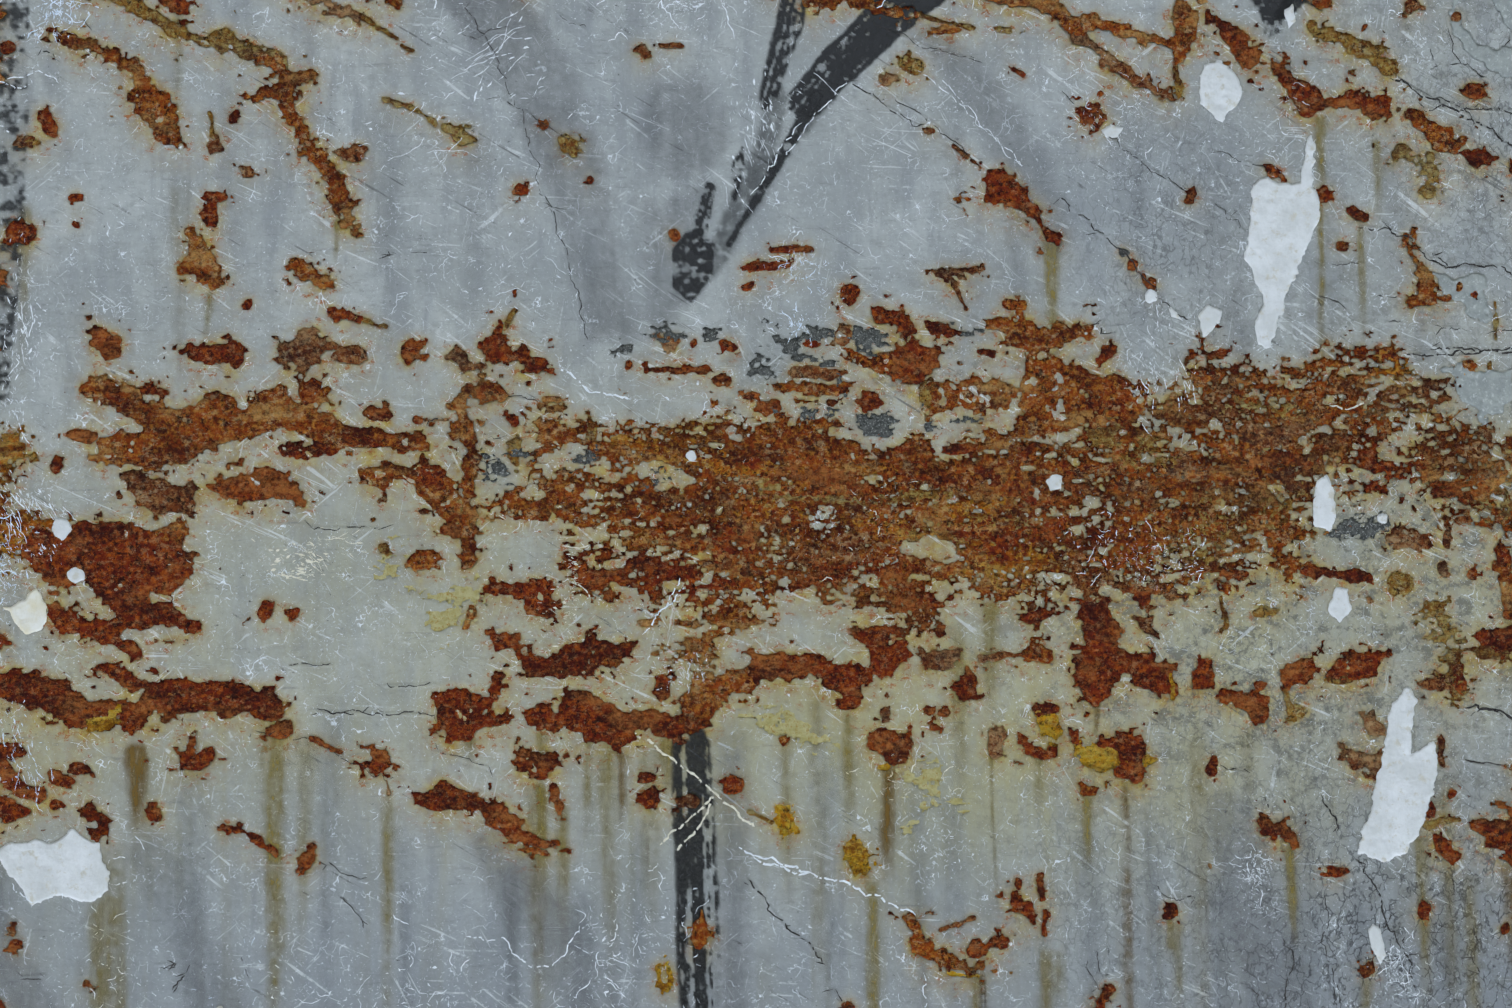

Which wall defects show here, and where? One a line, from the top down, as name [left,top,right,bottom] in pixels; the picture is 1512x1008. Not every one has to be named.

rust [12,104,58,148]
rust [31,0,368,238]
rust [879,50,929,86]
rust [802,0,1025,37]
peeling [1199,60,1242,122]
rust [988,0,1512,303]
peeling [1244,135,1320,349]
rust [0,143,1512,942]
peeling [1358,686,1438,862]
peeling [0,829,110,906]
rust [868,886,1016,1008]
rust [1089,980,1129,1008]